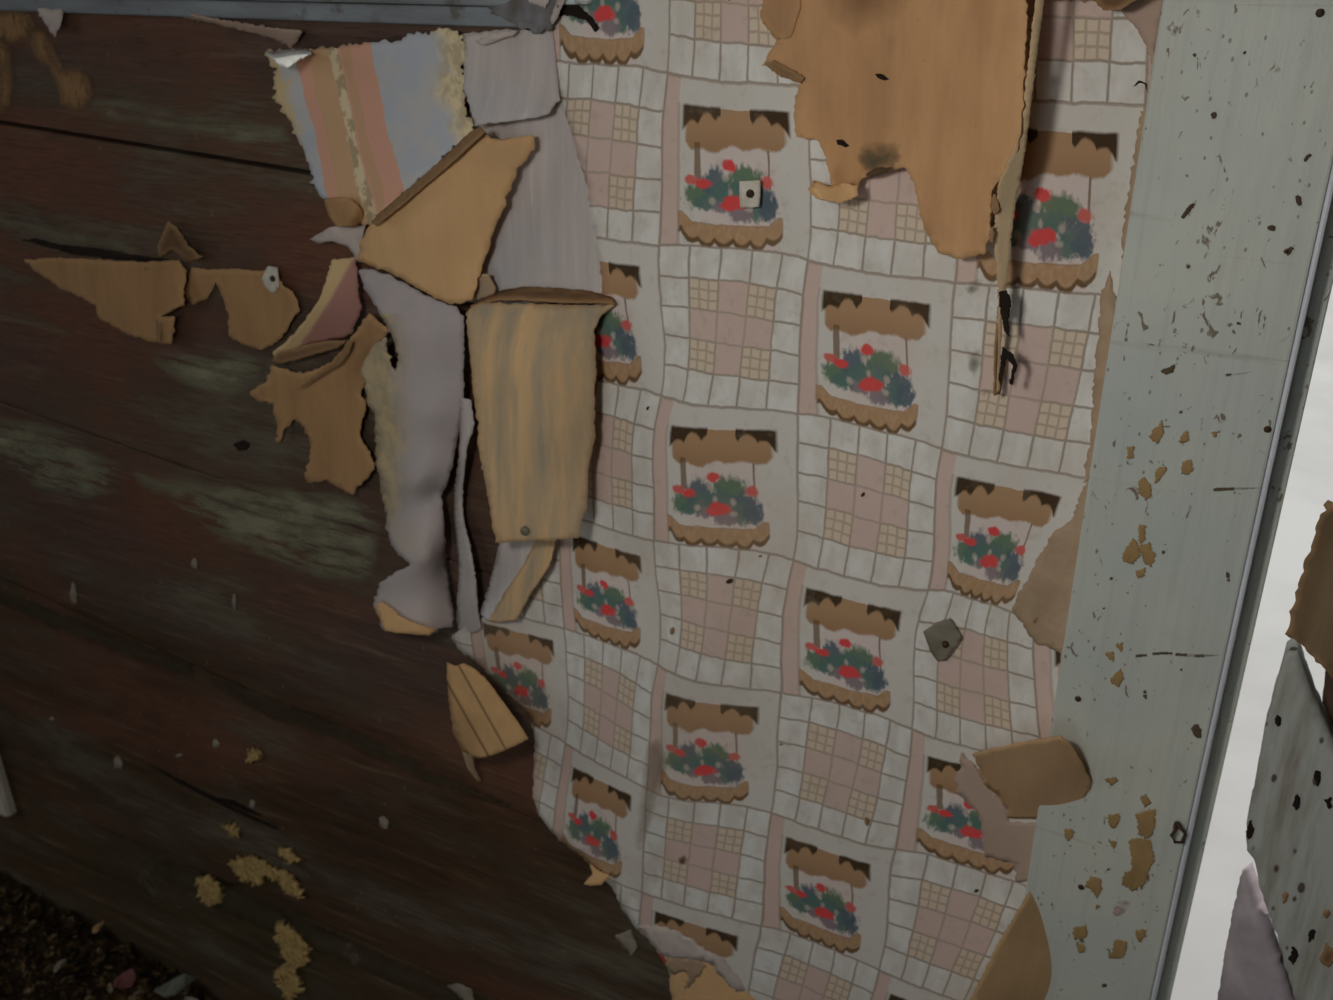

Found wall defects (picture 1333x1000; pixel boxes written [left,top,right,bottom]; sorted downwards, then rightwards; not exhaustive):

peeling [1094,0,1136,11]
peeling [760,0,1044,396]
peeling [359,269,616,636]
peeling [1138,459,1194,501]
peeling [1122,524,1164,578]
peeling [972,735,1118,819]
peeling [1314,770,1333,810]
peeling [1085,794,1156,915]
peeling [970,891,1052,1000]
peeling [1109,928,1147,959]
peeling [1288,909,1333,967]
peeling [665,957,755,1000]